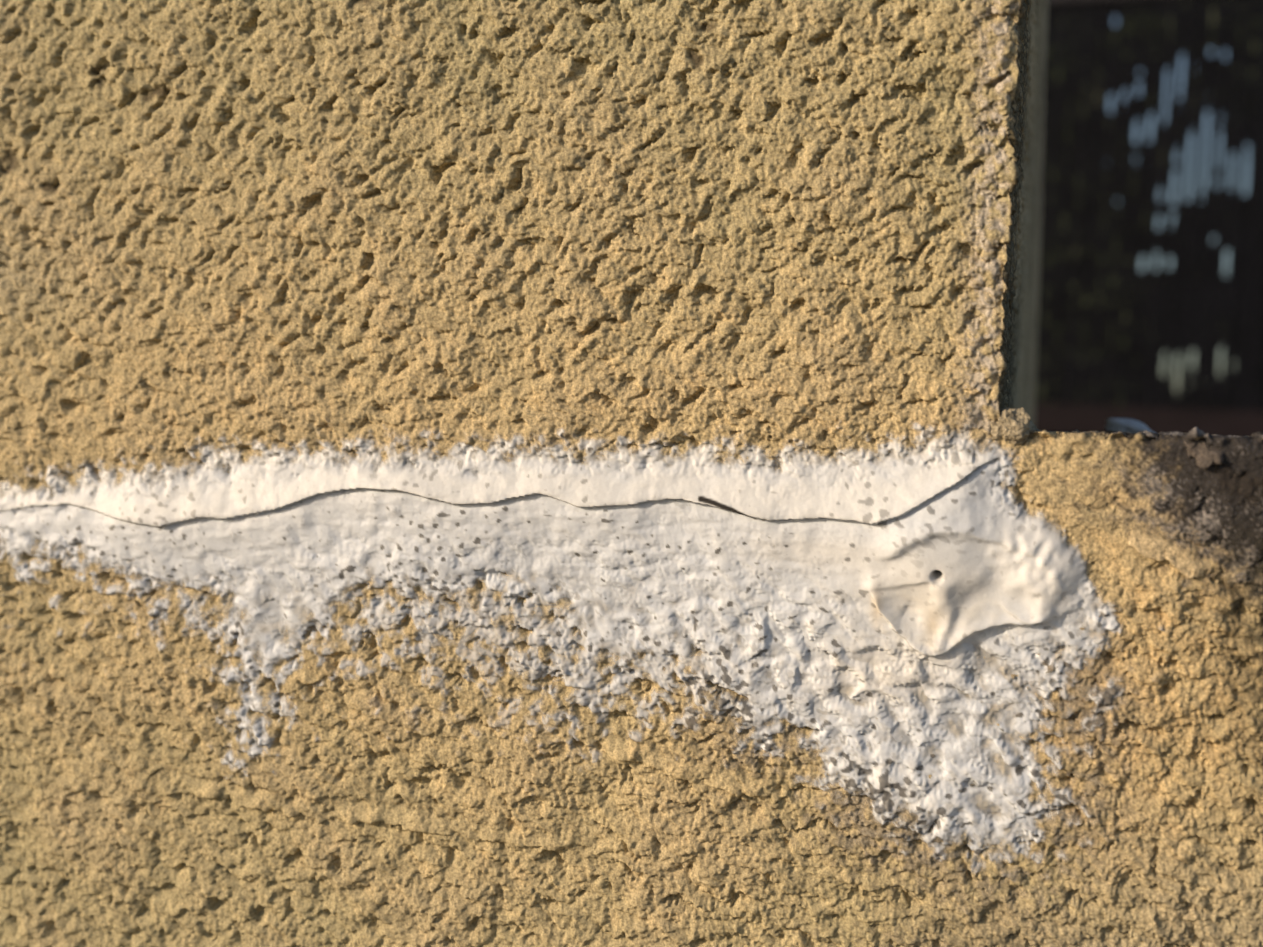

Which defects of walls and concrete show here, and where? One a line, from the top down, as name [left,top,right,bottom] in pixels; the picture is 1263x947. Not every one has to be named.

water stain [1114,427,1263,675]